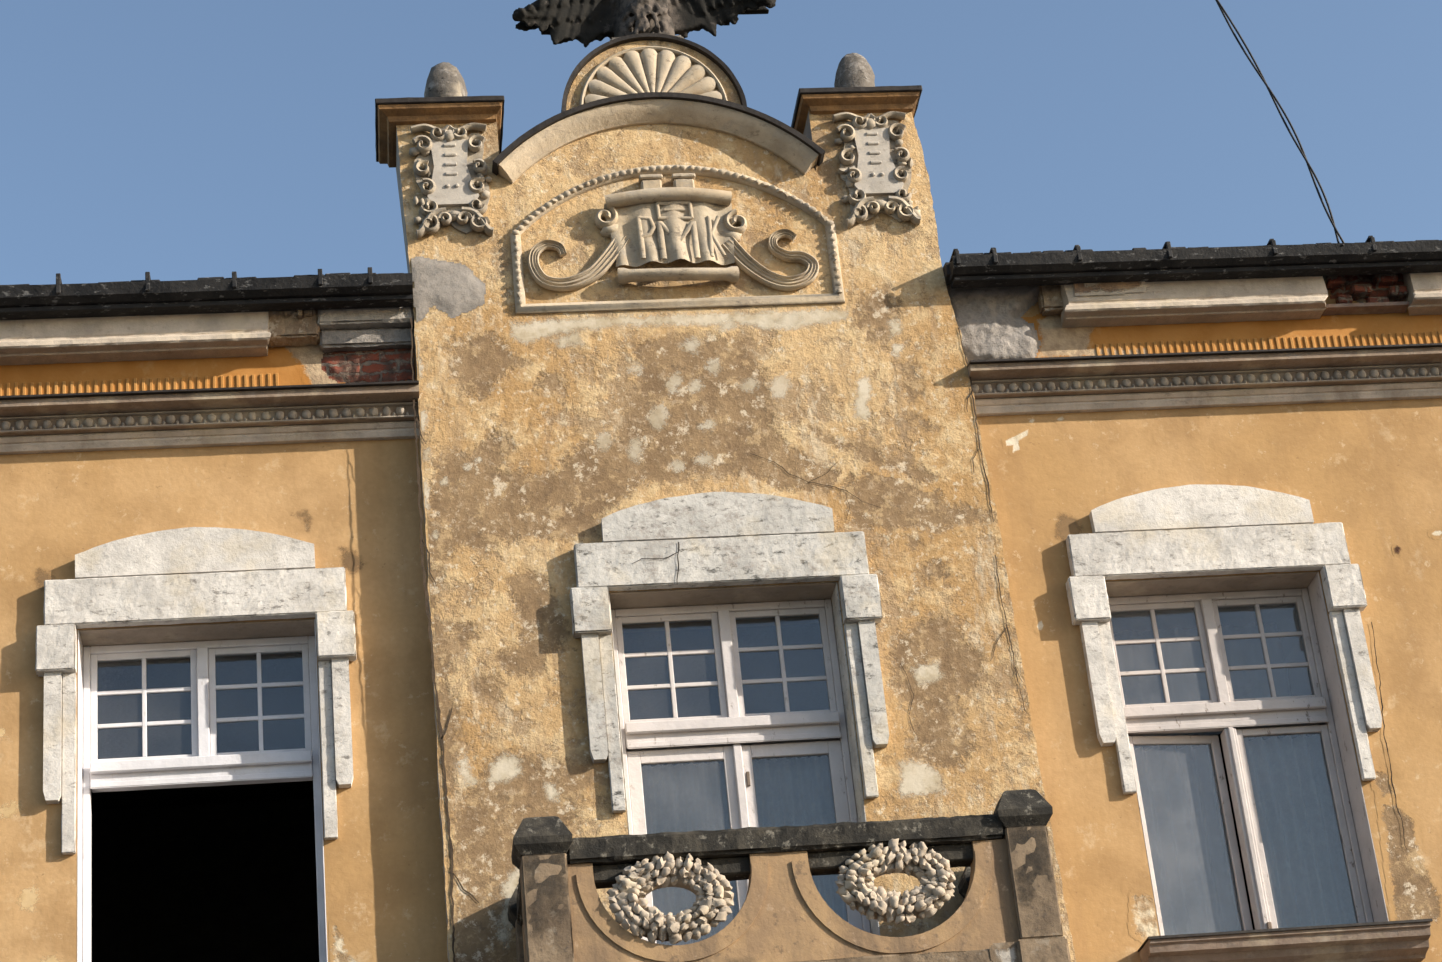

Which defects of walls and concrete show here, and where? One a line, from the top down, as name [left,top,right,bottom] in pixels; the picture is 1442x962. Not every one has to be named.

crack [750,453,881,522]
peeling [846,280,944,436]
crack [958,327,1025,710]
peeling [1001,413,1068,456]
flaking render [1322,274,1409,316]
crack [410,318,479,962]
peeling [275,319,997,962]
spalling [989,942,1019,962]